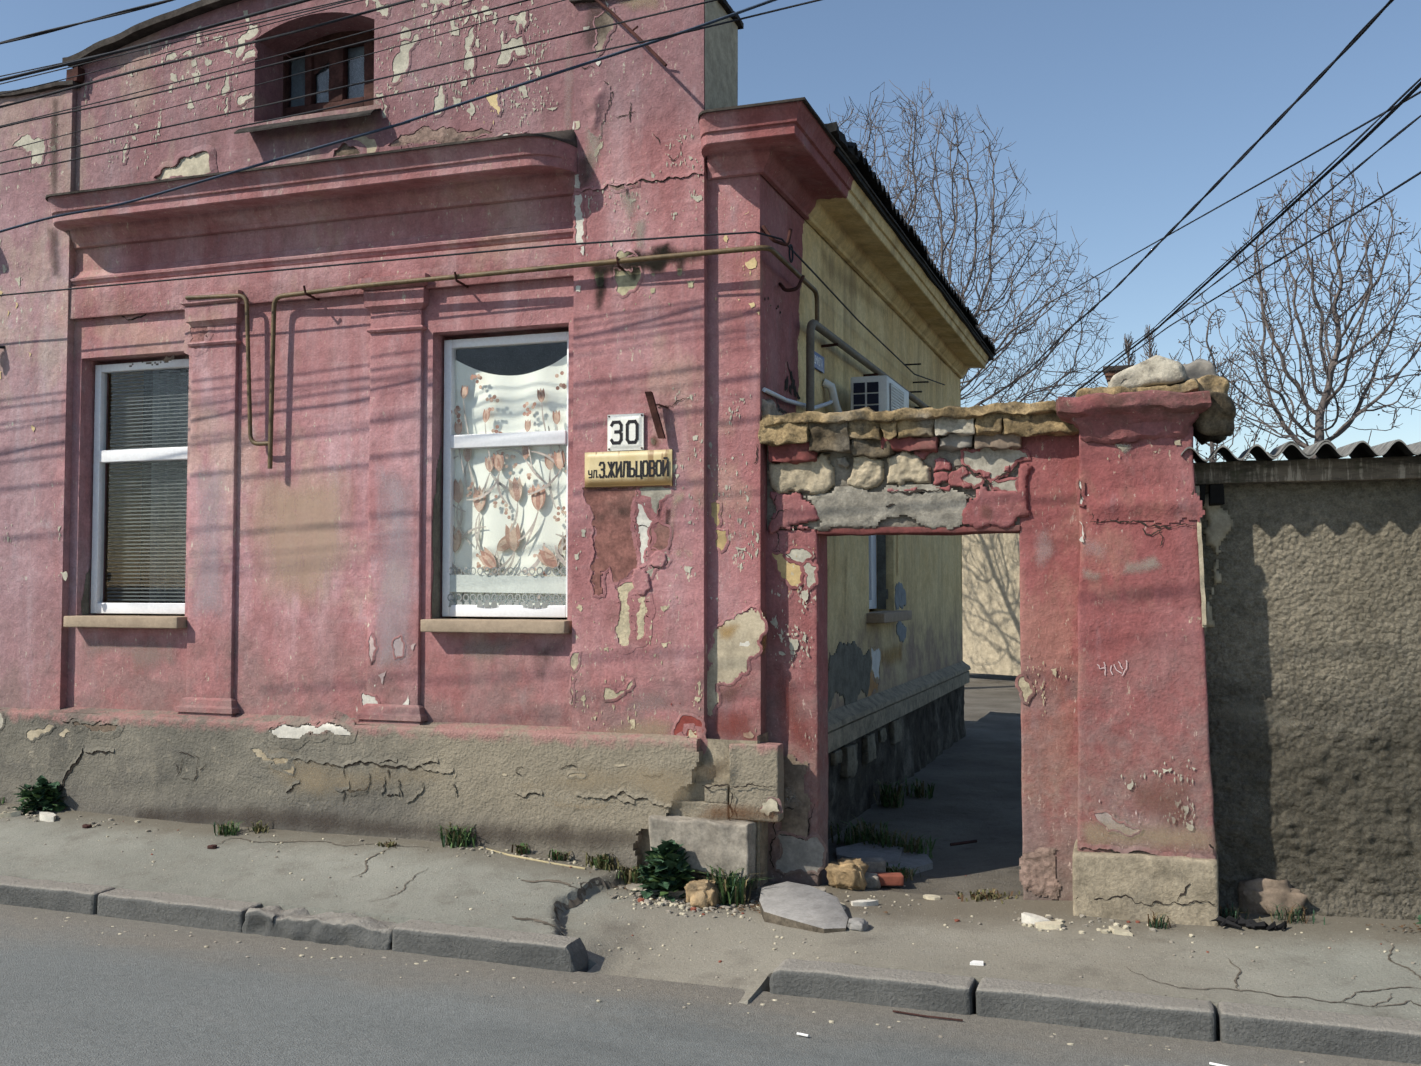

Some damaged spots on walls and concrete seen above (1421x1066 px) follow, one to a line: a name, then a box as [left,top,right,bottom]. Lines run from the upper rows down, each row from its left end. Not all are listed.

peeling [94,10,261,181]
spalling [329,0,560,158]
spalling [767,447,1031,531]
peeling [568,393,819,754]
peeling [867,645,881,697]
spalling [25,713,124,743]
spalling [245,685,380,777]
crack [58,746,114,792]
crack [285,754,457,803]
crack [511,871,626,935]
crack [1076,842,1214,906]
crack [1127,939,1421,1006]